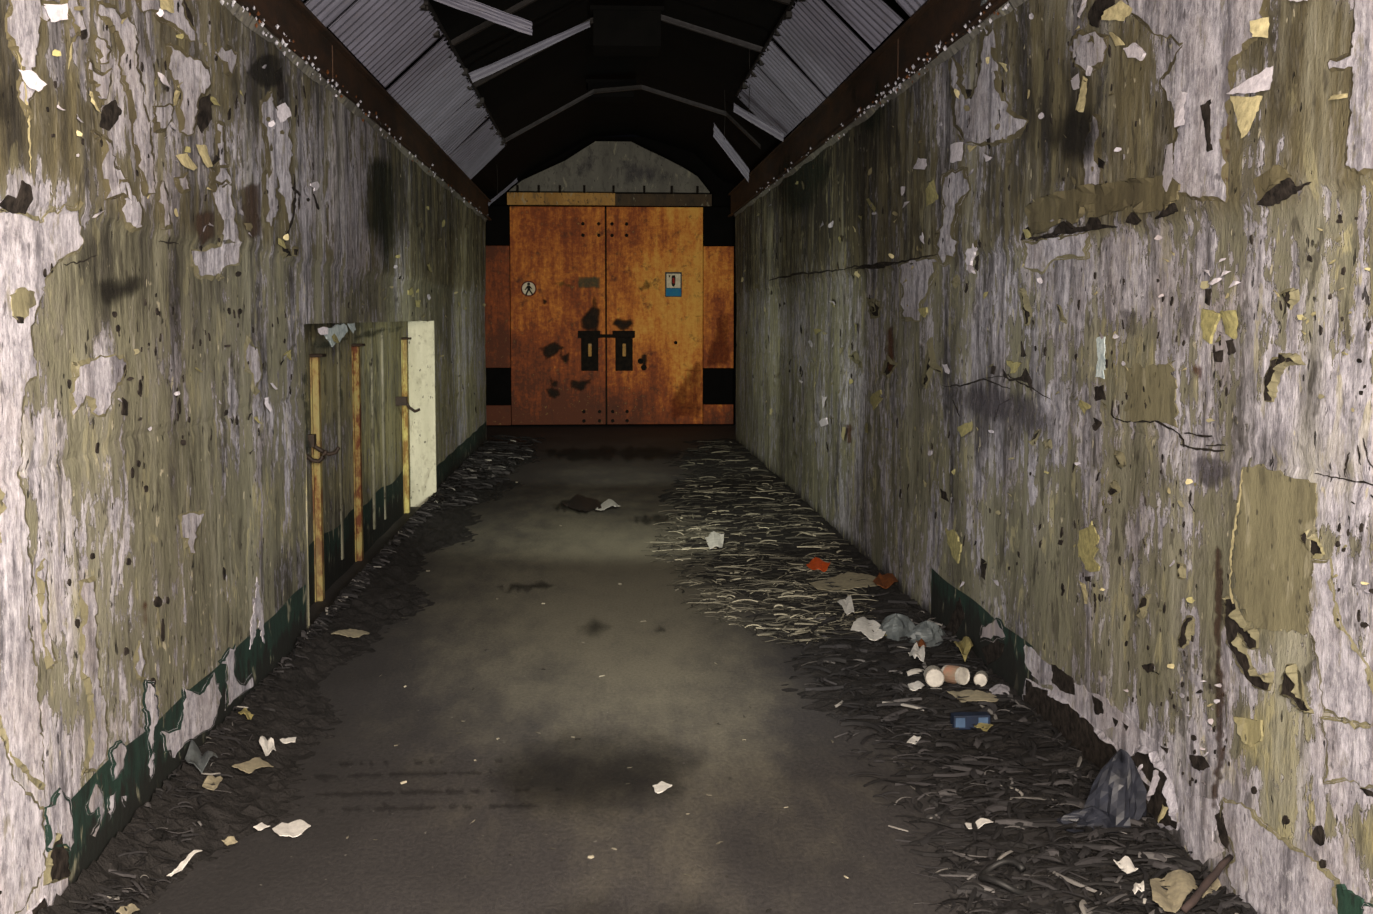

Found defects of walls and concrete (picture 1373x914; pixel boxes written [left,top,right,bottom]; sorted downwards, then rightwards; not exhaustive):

peeling [318,201,446,347]